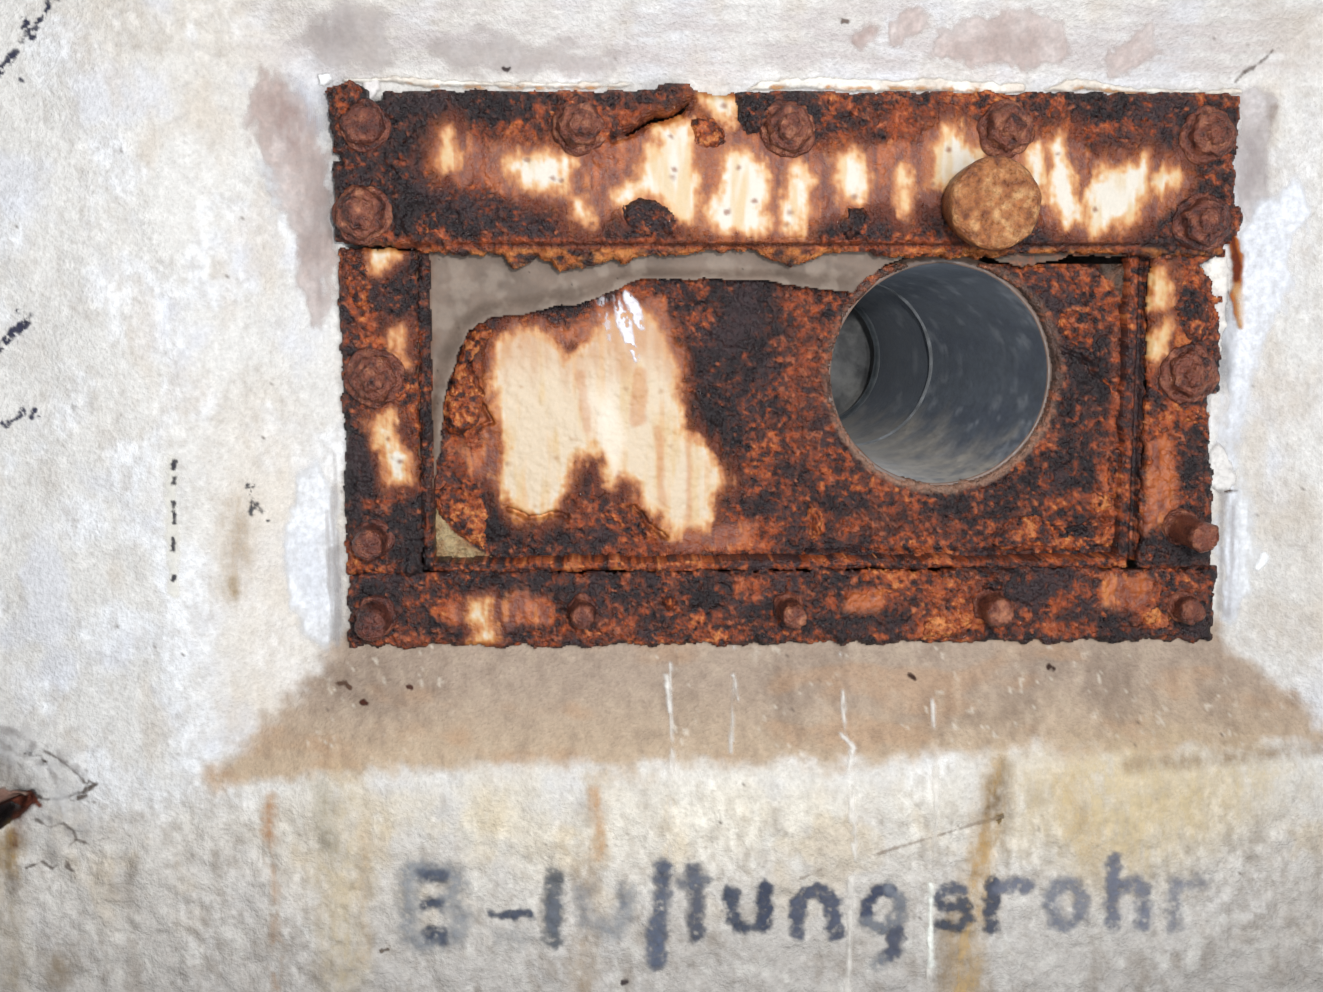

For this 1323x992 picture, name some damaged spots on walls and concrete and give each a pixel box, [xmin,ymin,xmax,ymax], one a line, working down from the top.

corrosion [328,80,363,140]
corrosion [690,118,726,148]
corrosion [735,92,770,135]
corrosion [622,198,677,236]
corrosion [1174,280,1212,343]
corrosion [443,323,492,435]
corrosion [435,483,489,549]
corrosion [976,448,1120,554]
damp [665,664,673,726]
damp [841,692,856,770]
damp [845,876,855,992]
damp [927,883,935,978]